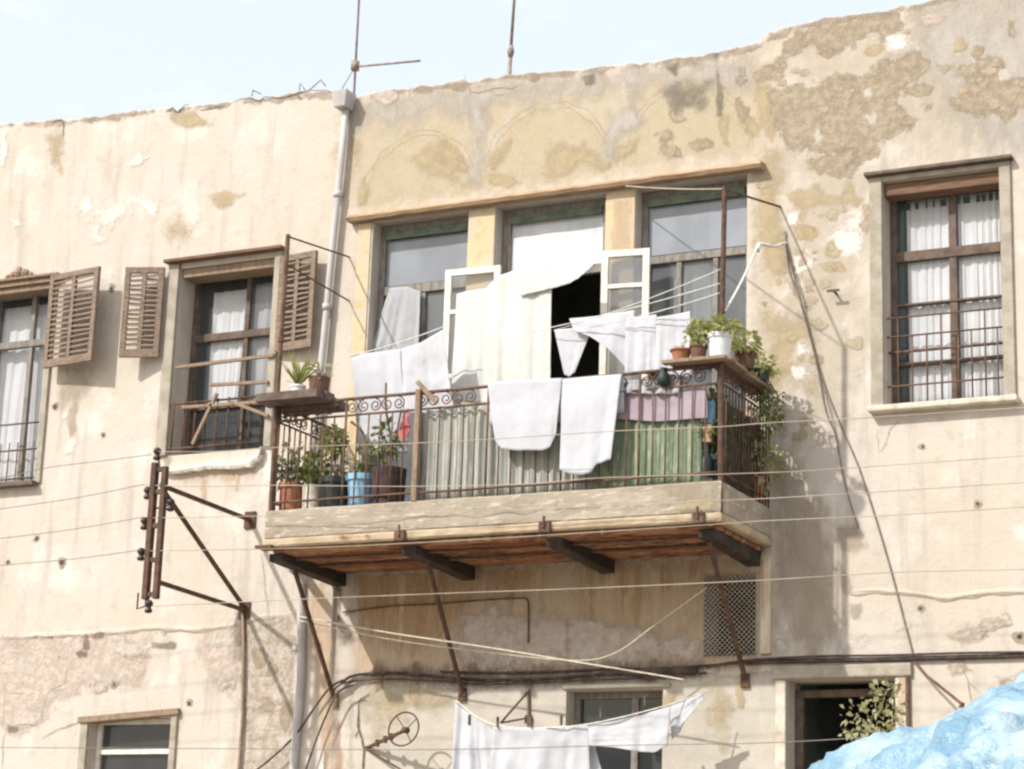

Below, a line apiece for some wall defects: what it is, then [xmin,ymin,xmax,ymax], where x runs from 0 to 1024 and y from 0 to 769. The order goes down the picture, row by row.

water stain [170,112,205,126]
peeling [660,112,713,156]
flaking render [735,11,1024,330]
water stain [212,191,233,207]
peeling [769,335,823,385]
flaking render [0,631,176,736]